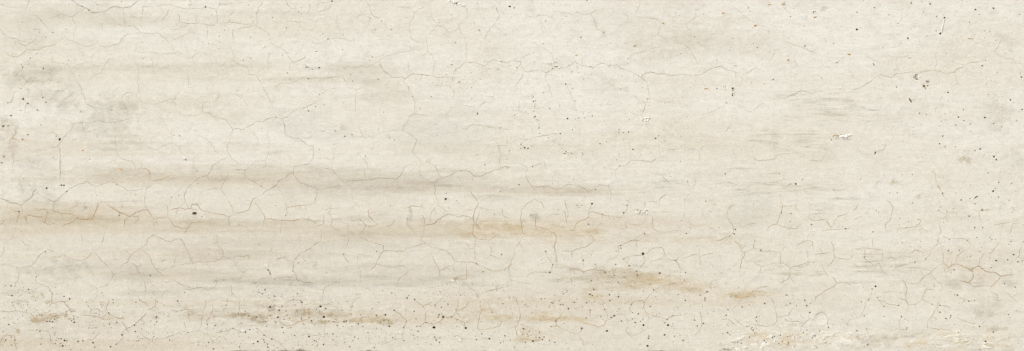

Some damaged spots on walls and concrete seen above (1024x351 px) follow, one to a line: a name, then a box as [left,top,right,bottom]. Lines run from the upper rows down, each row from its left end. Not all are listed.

crack [2,80,1020,349]